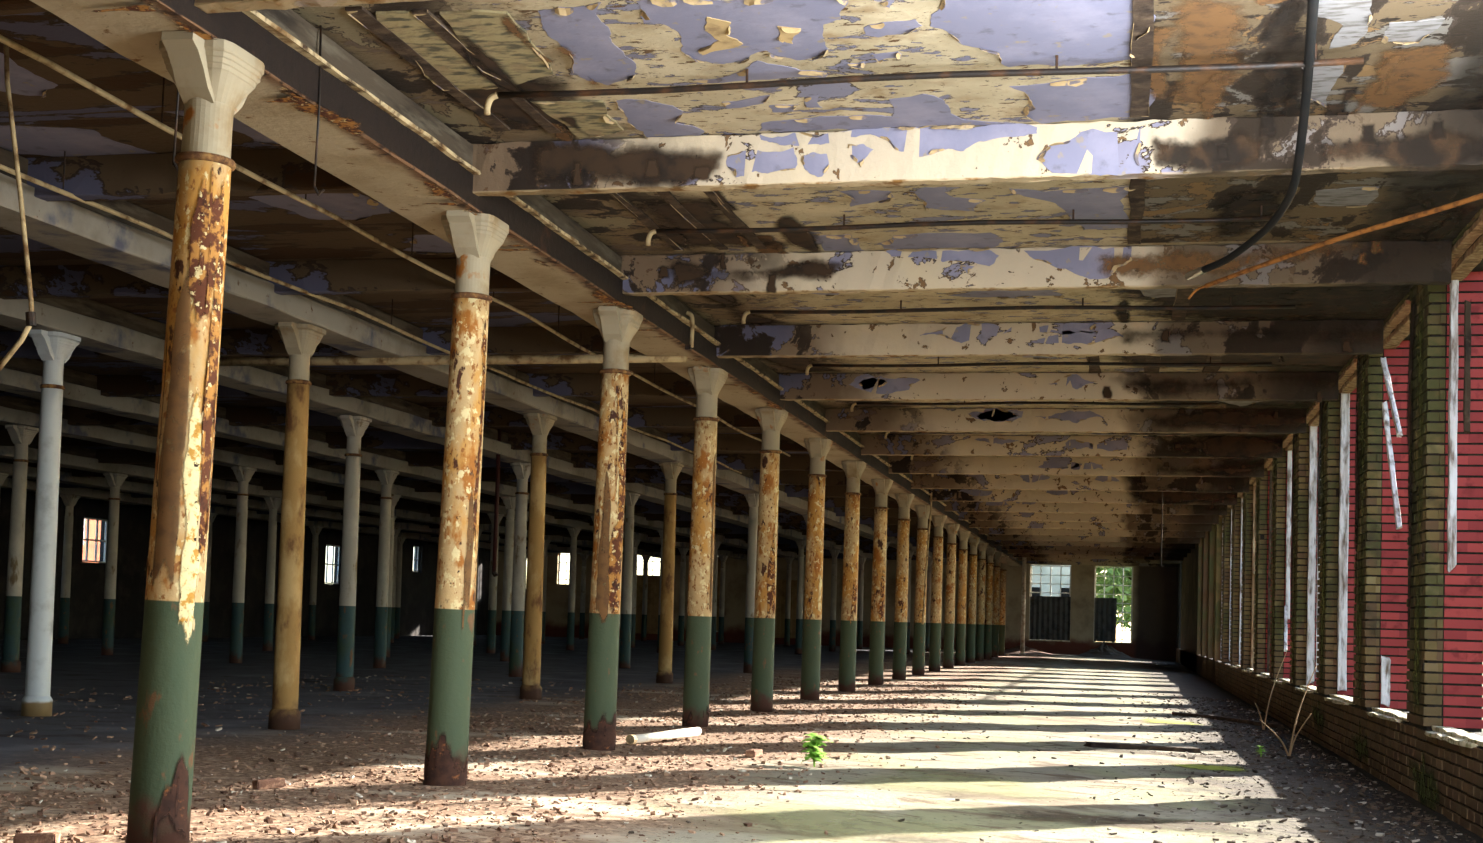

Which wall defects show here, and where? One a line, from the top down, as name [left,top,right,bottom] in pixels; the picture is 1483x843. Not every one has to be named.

peeling [347,2,705,139]
leakage [441,22,841,326]
peeling [636,0,1156,279]
peeling [820,233,1064,299]
leakage [1153,0,1303,172]
leakage [1214,192,1288,236]
peeling [1301,0,1445,107]
rust [152,168,225,584]
rust [462,320,487,629]
rust [596,387,627,623]
rust [767,535,776,614]
peeling [959,408,1130,506]